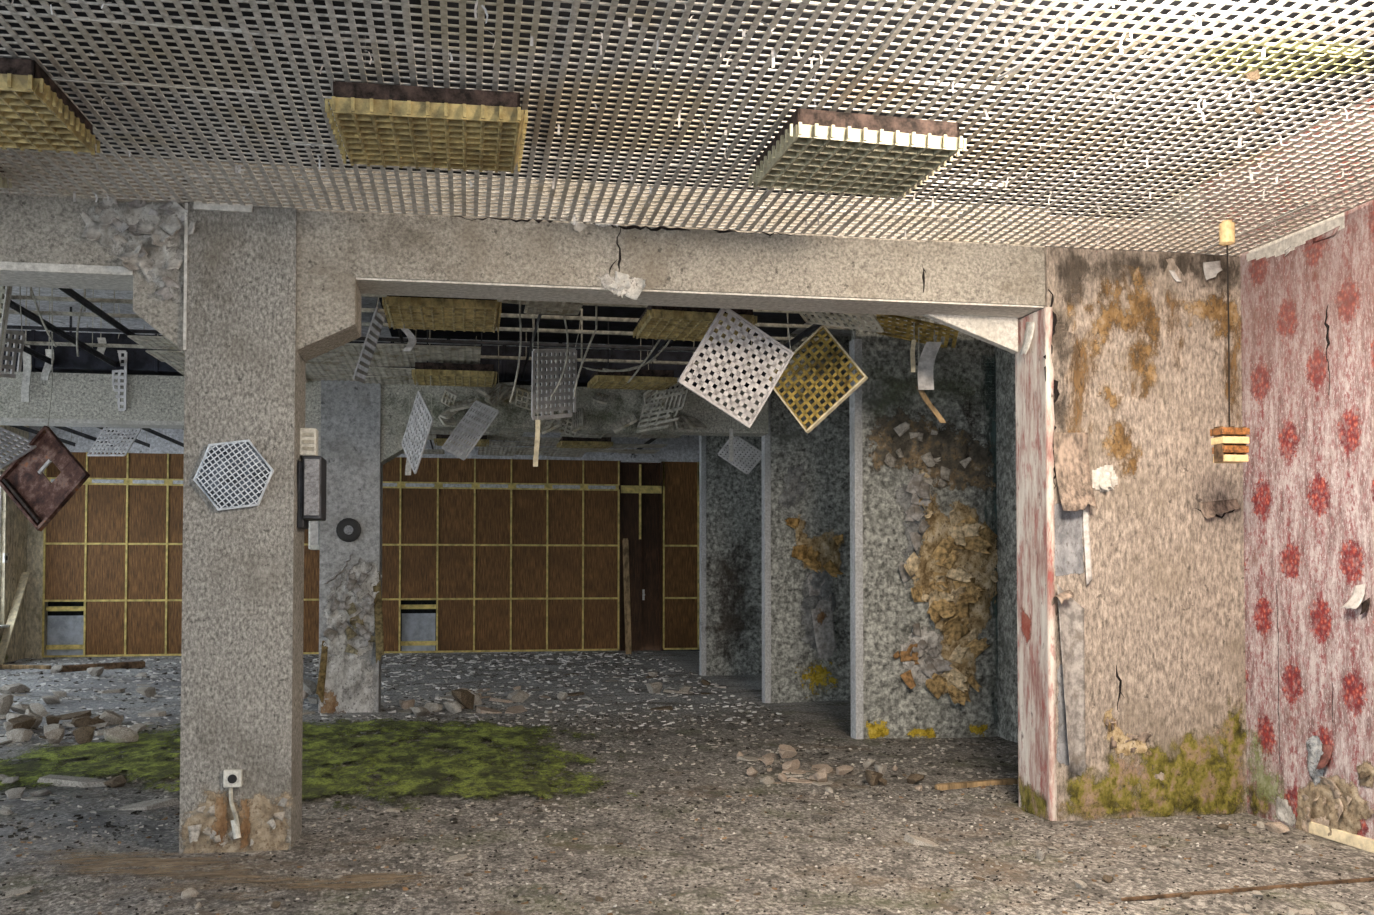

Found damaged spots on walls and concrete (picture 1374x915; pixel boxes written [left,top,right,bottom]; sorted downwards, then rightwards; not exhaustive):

peeling [80,188,196,303]
crack [450,216,795,274]
peeling [1020,322,1035,355]
leakage [1052,250,1242,479]
peeling [316,554,384,714]
leakage [705,533,754,659]
flaking render [778,458,845,661]
flaking render [866,406,998,706]
peeling [1021,607,1032,645]
flaking render [179,788,293,854]
flaking render [1275,735,1374,845]